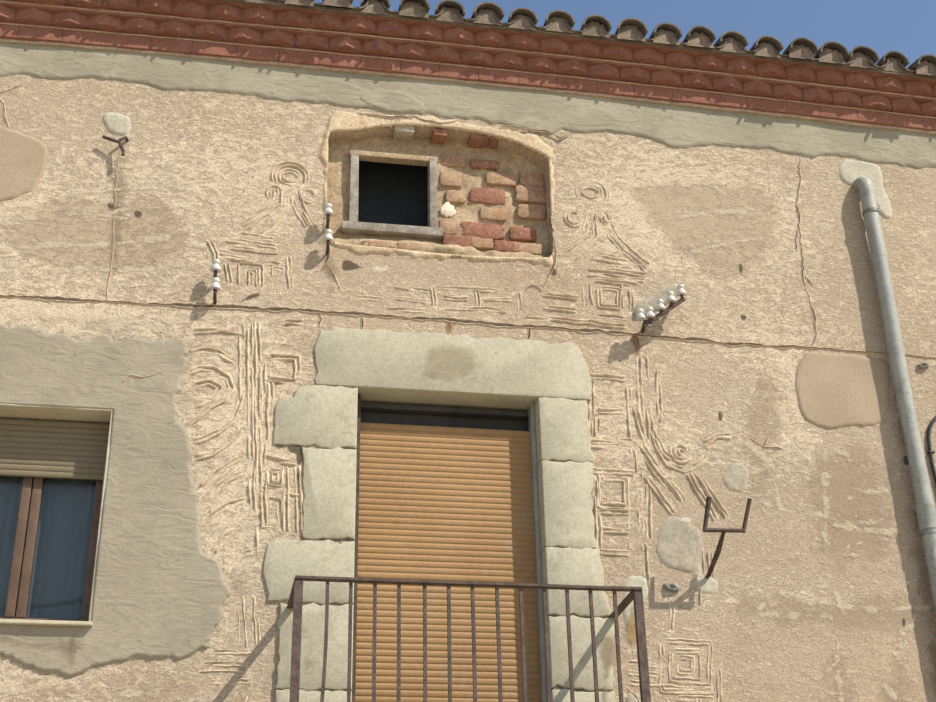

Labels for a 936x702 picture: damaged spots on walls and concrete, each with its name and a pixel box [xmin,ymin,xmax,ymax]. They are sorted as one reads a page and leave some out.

crack [0,84,24,128]
crack [359,113,457,125]
crack [502,125,571,139]
crack [0,155,936,359]